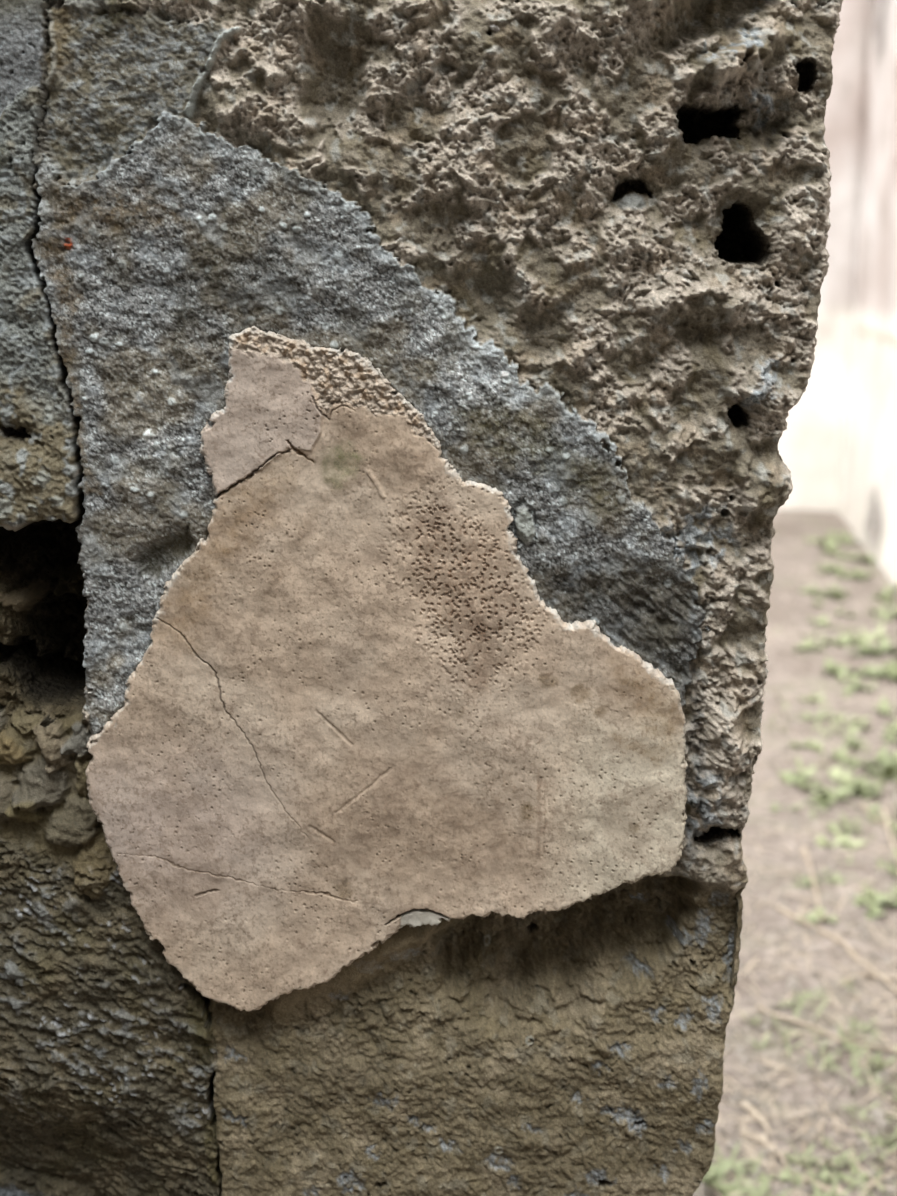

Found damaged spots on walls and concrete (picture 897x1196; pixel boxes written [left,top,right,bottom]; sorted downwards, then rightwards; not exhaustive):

crack [27,0,85,528]
crack [214,440,315,500]
spalling [0,519,88,730]
crack [156,618,307,836]
crack [119,854,358,903]
crack [179,982,223,1196]